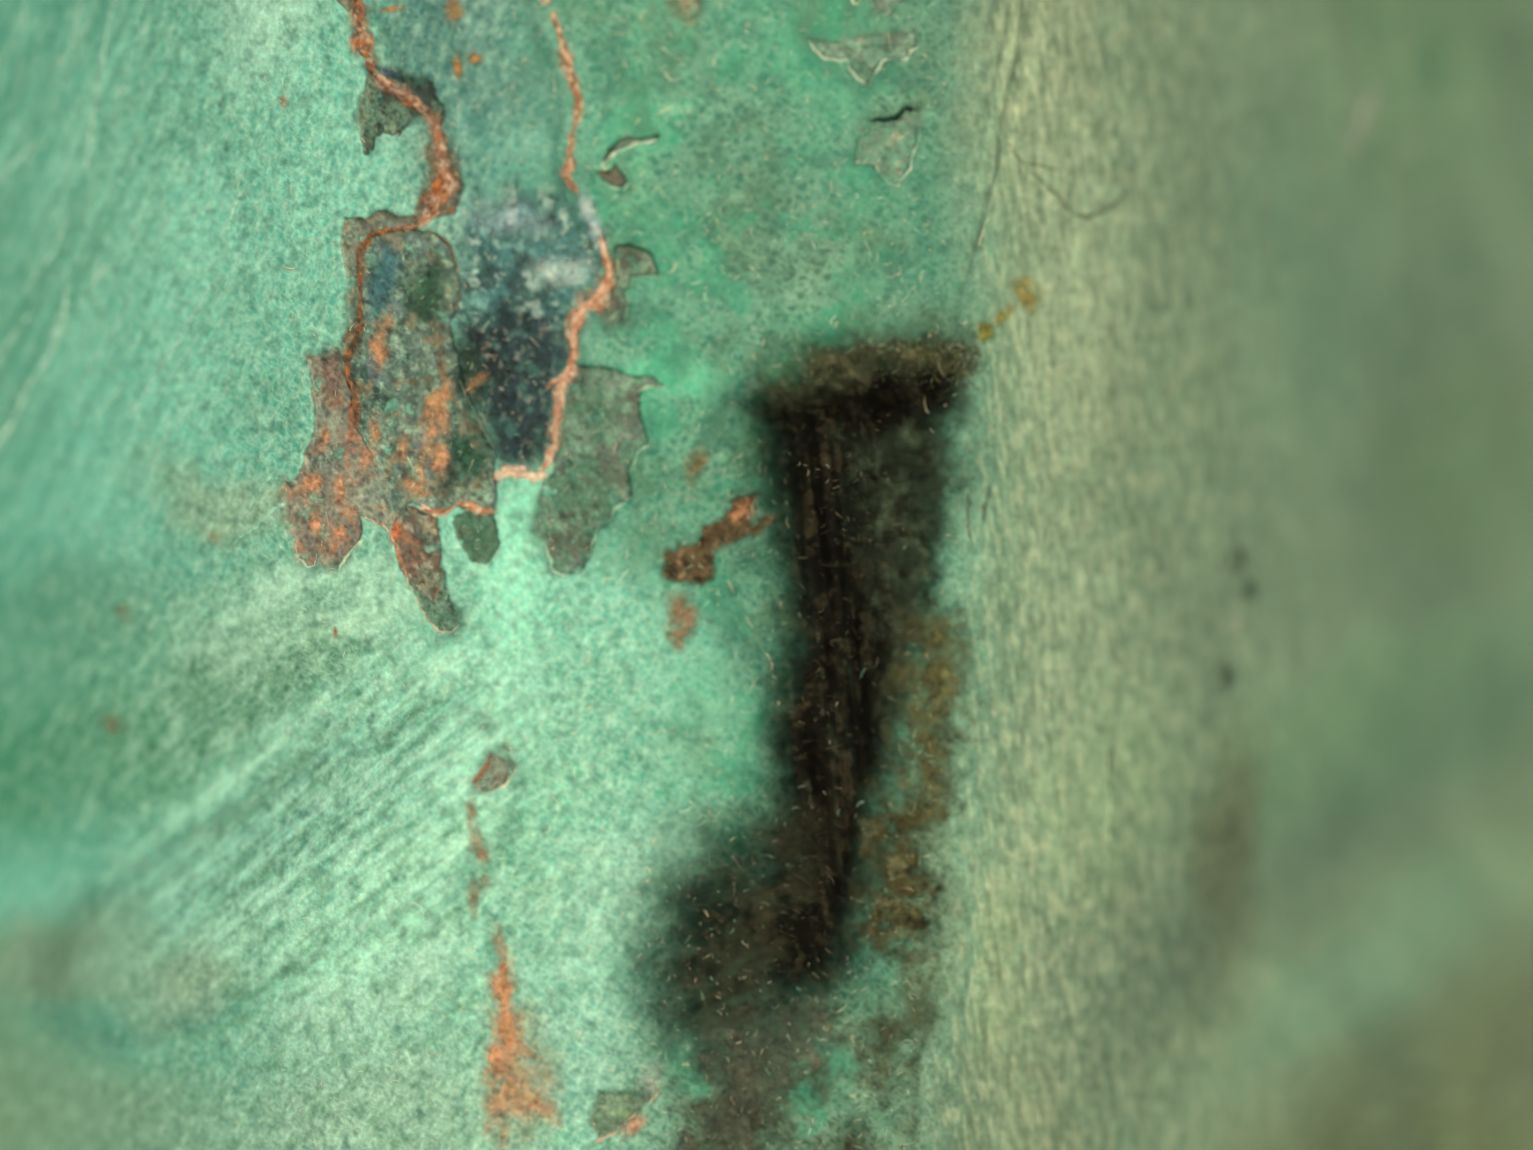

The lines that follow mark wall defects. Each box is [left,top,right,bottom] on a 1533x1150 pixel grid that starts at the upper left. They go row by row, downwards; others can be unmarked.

spalling [337,0,353,11]
peeling [807,32,926,86]
peeling [845,107,930,199]
peeling [598,244,708,328]
peeling [283,69,672,634]
damp [894,618,967,831]
rust [468,805,487,860]
rust [488,962,554,1116]
peeling [591,1079,661,1144]
damp [676,1008,840,1150]